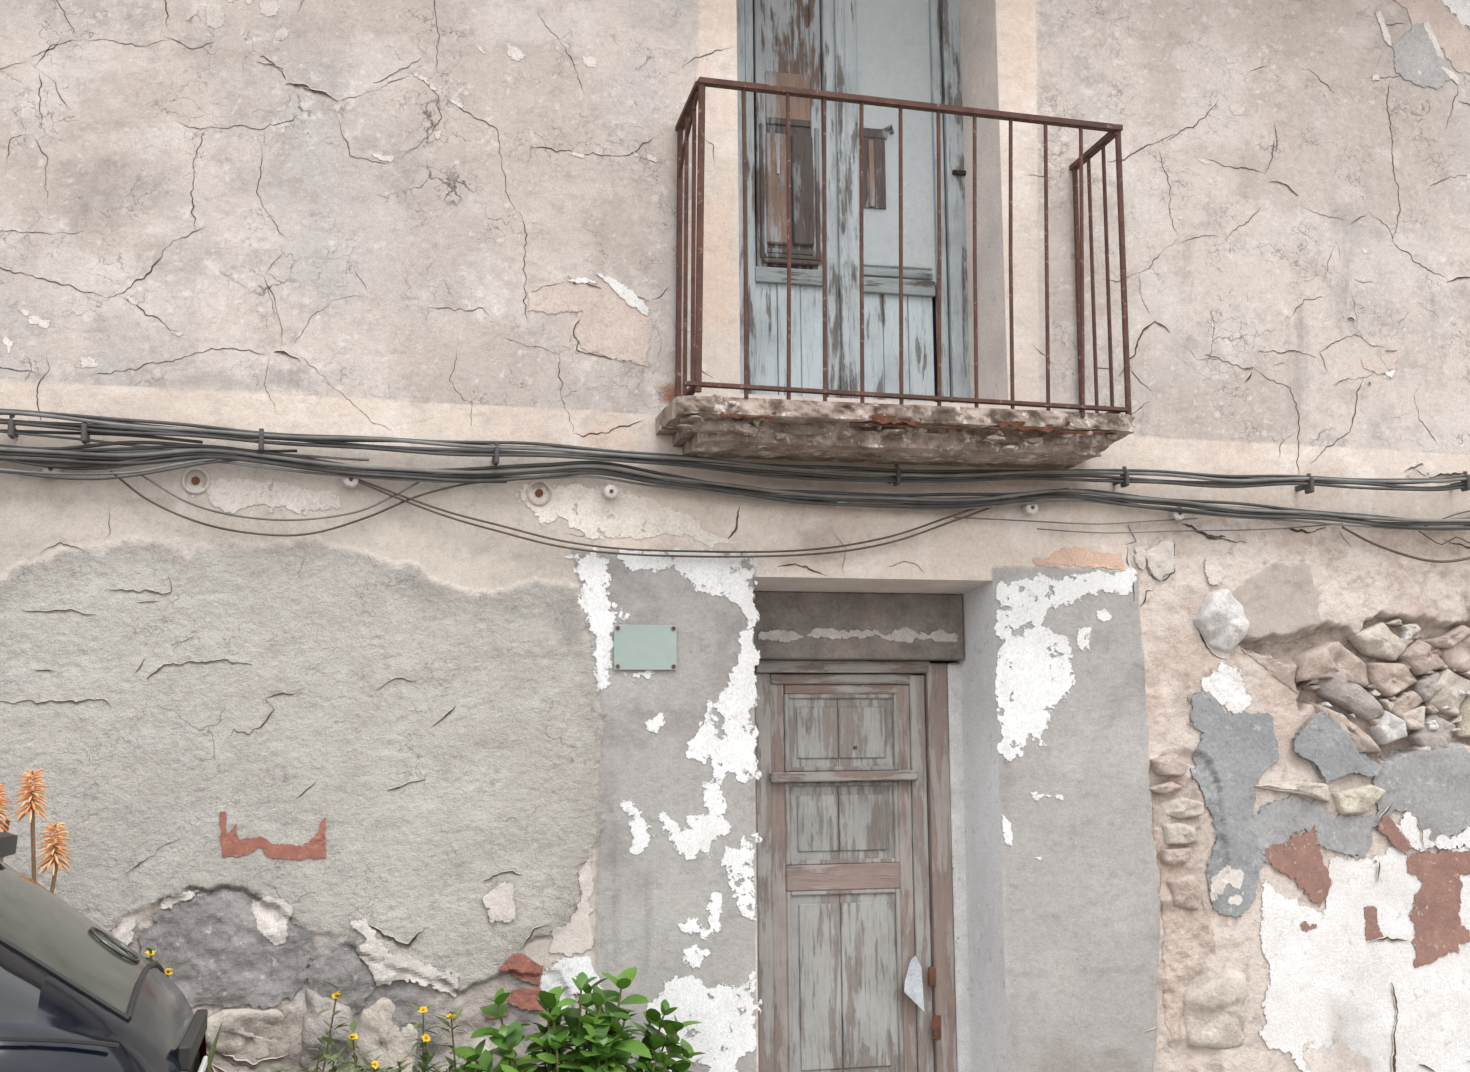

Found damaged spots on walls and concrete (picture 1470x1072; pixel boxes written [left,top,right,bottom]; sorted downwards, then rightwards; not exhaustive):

peeling [1376,0,1470,84]
crack [0,0,666,437]
spalling [526,273,652,367]
crack [1102,75,1470,469]
crack [0,669,110,705]
crack [24,576,173,615]
crack [135,635,252,679]
crack [230,692,298,736]
peeling [499,483,958,1072]
peeling [993,537,1175,767]
peeling [1149,618,1470,1072]
spalling [109,886,460,1072]